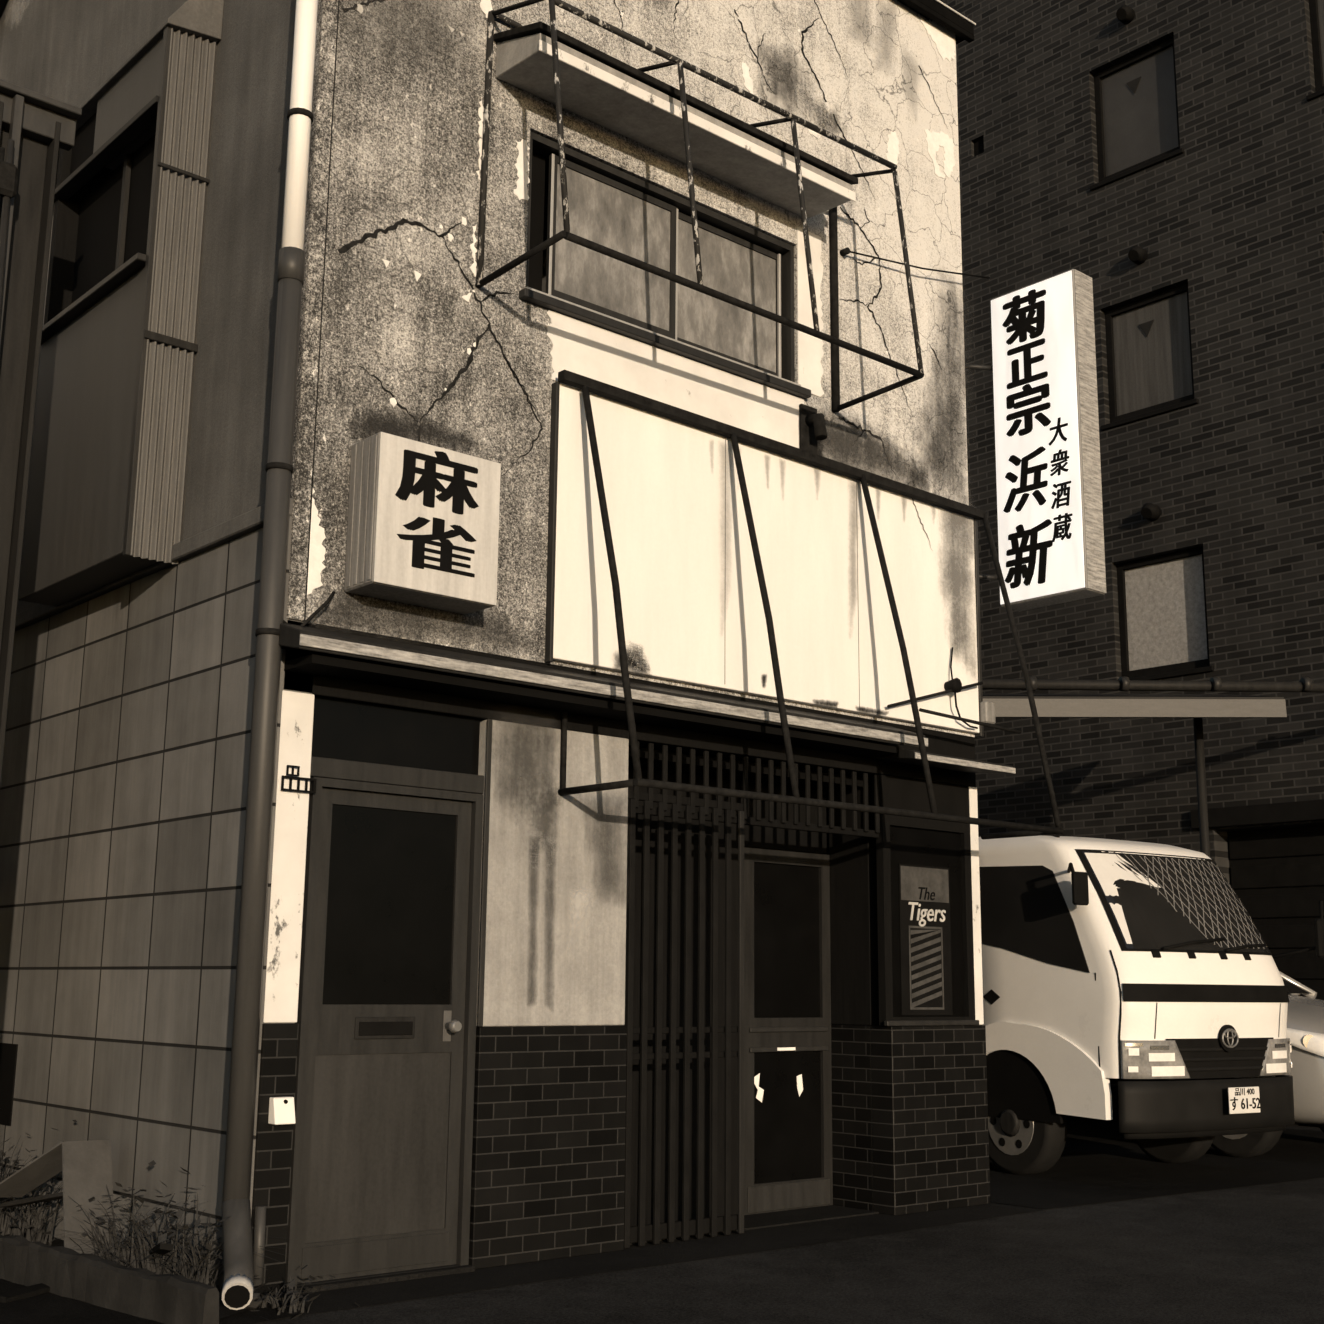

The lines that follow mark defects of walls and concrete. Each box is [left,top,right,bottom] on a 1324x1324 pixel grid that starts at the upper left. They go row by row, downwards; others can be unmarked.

peeling [480,0,493,18]
crack [734,9,772,91]
peeling [740,59,791,110]
damp [764,54,807,107]
damp [817,108,837,129]
peeling [824,102,838,115]
peeling [886,131,899,165]
crack [798,0,913,417]
crack [338,217,543,476]
damp [505,714,556,1002]